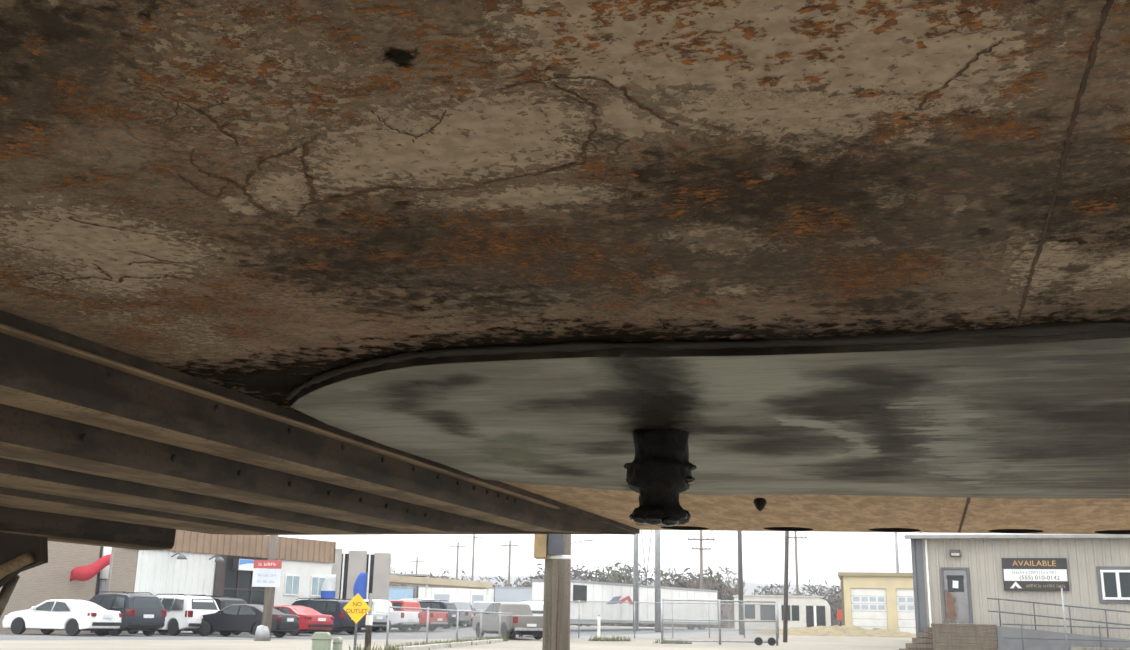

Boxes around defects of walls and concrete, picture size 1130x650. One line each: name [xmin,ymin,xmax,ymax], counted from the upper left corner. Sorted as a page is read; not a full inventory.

peeling [91,0,1068,222]
corrosion [135,0,1026,124]
crack [918,41,1002,111]
corrosion [869,73,1053,144]
crack [127,76,679,246]
corrosion [659,159,799,219]
crack [26,212,201,286]
leakage [155,185,1130,416]
peeling [633,271,768,298]
peeling [647,216,802,259]
leakage [699,369,1029,488]